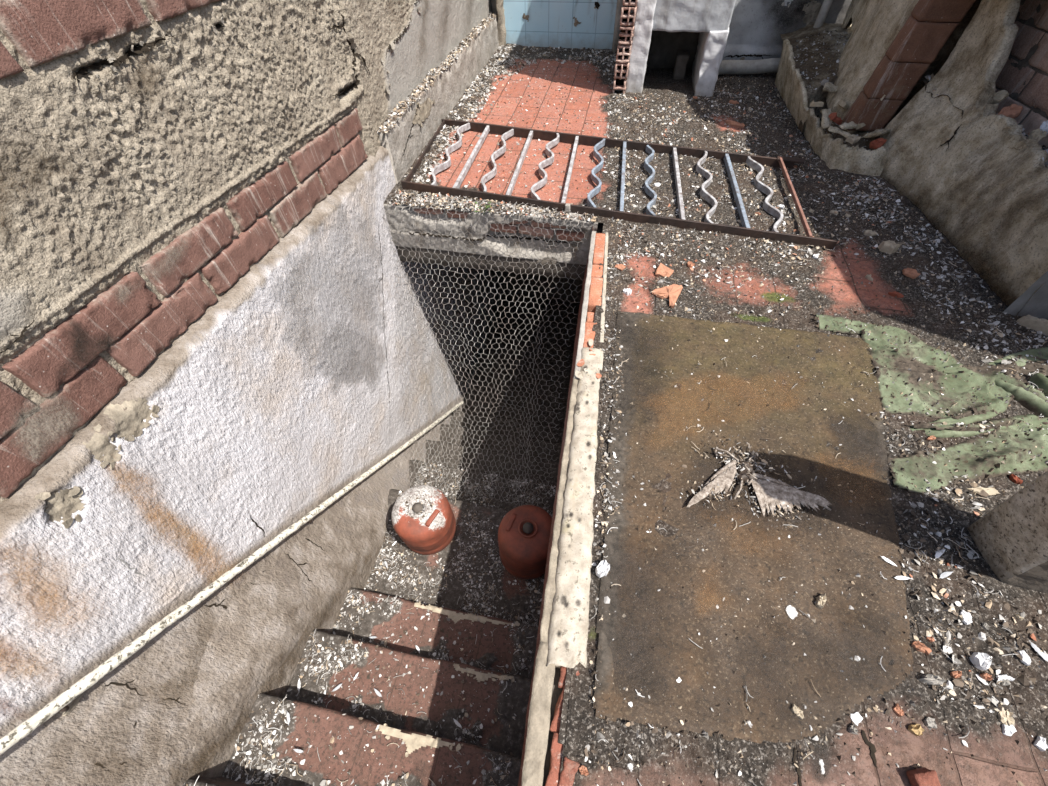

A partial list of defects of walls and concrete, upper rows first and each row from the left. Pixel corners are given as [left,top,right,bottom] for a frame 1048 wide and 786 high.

crack [73,34,179,80]
crack [330,0,441,98]
crack [939,125,961,151]